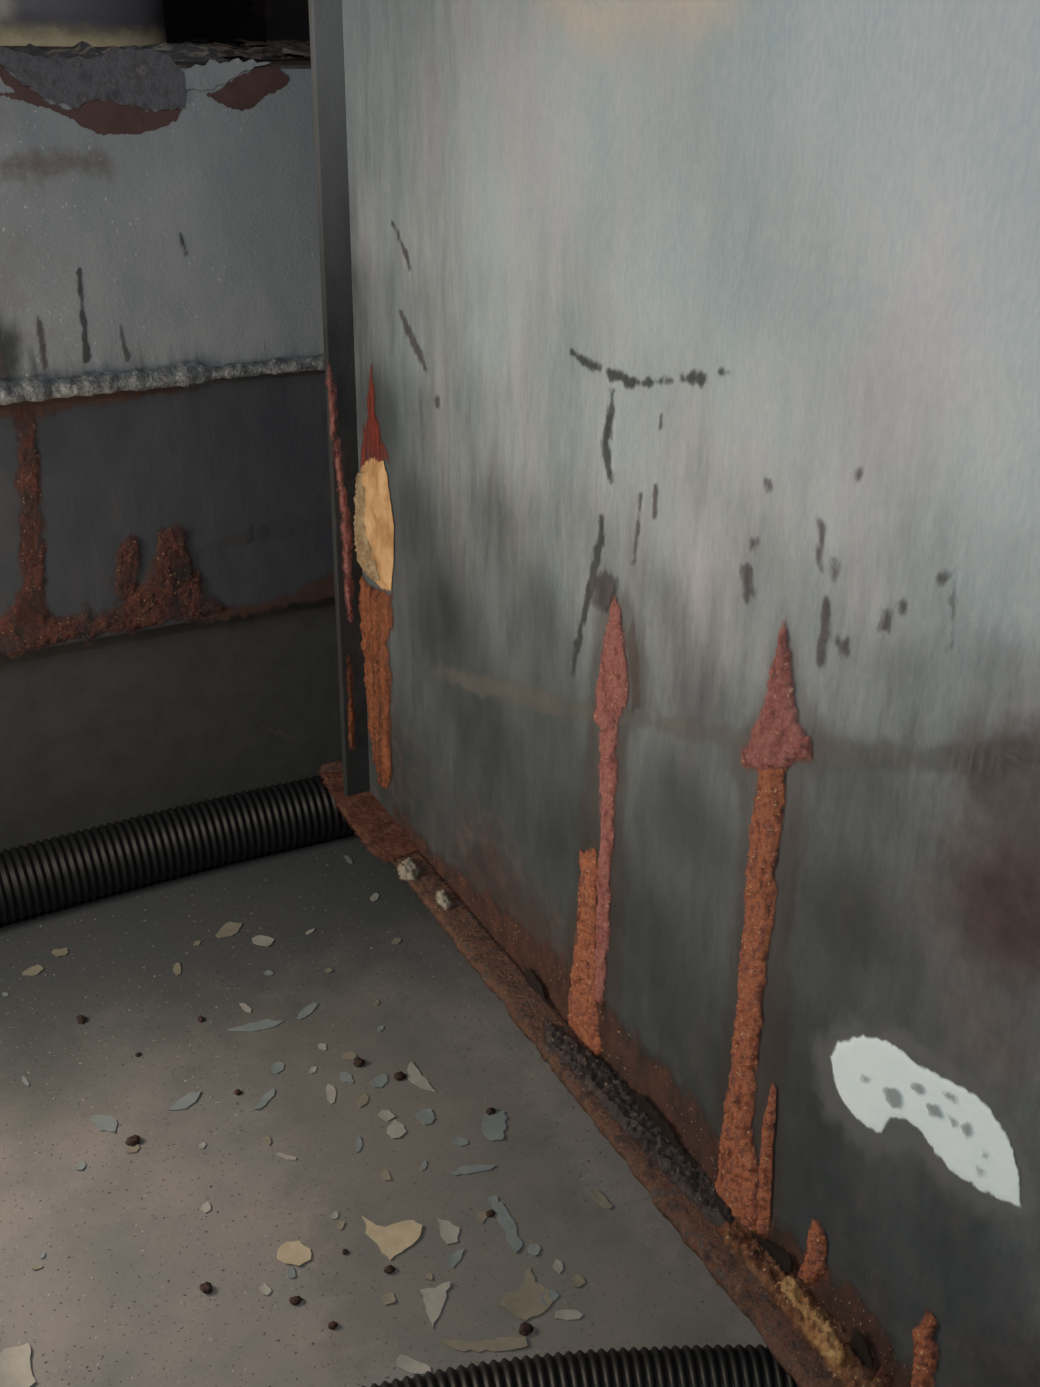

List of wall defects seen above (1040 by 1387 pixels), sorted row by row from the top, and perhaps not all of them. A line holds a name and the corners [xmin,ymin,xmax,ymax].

peeling [0,47,290,135]
corrosion [0,386,224,656]
corrosion [326,364,393,789]
crack [602,390,614,479]
crack [572,484,657,673]
corrosion [568,572,628,1057]
corrosion [715,624,811,1238]
peeling [817,1023,1034,1216]
corrosion [798,1220,826,1285]
corrosion [874,1310,938,1387]